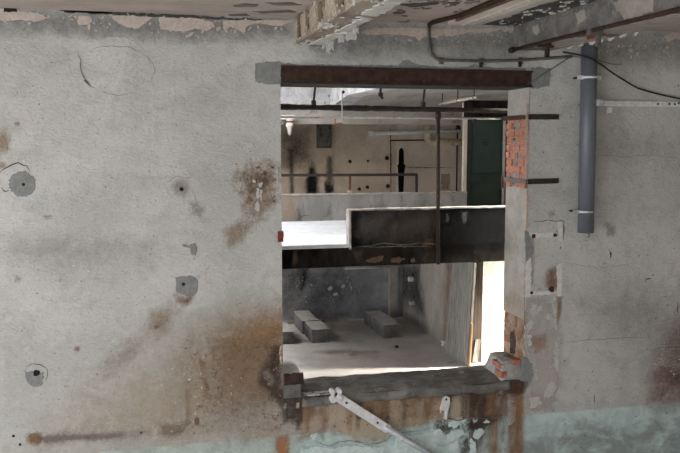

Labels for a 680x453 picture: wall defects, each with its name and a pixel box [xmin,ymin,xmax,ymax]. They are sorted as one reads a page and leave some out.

peeling [0,8,47,22]
peeling [68,14,92,30]
peeling [112,15,215,38]
peeling [223,0,596,55]
peeling [552,0,680,50]
crack [78,45,155,96]
rust [228,164,278,244]
rust [151,325,386,453]
peeling [300,414,495,453]
rust [356,381,523,453]